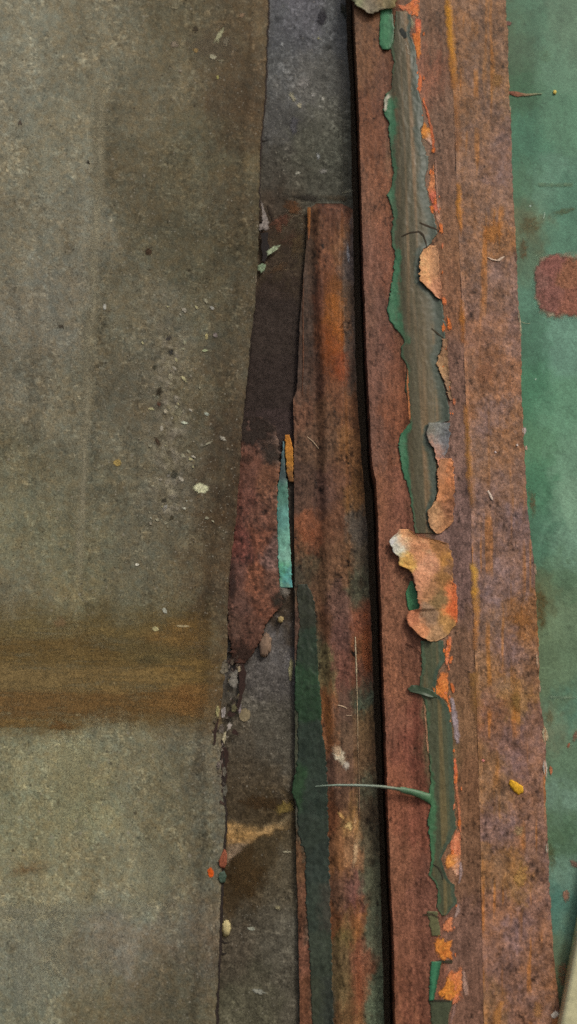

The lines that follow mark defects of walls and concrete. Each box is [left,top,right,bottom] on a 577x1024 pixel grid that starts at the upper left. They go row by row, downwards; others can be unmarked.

corrosion [446,5,457,88]
corrosion [535,253,577,317]
corrosion [285,435,294,482]
peeling [277,0,462,1024]
corrosion [471,565,479,639]